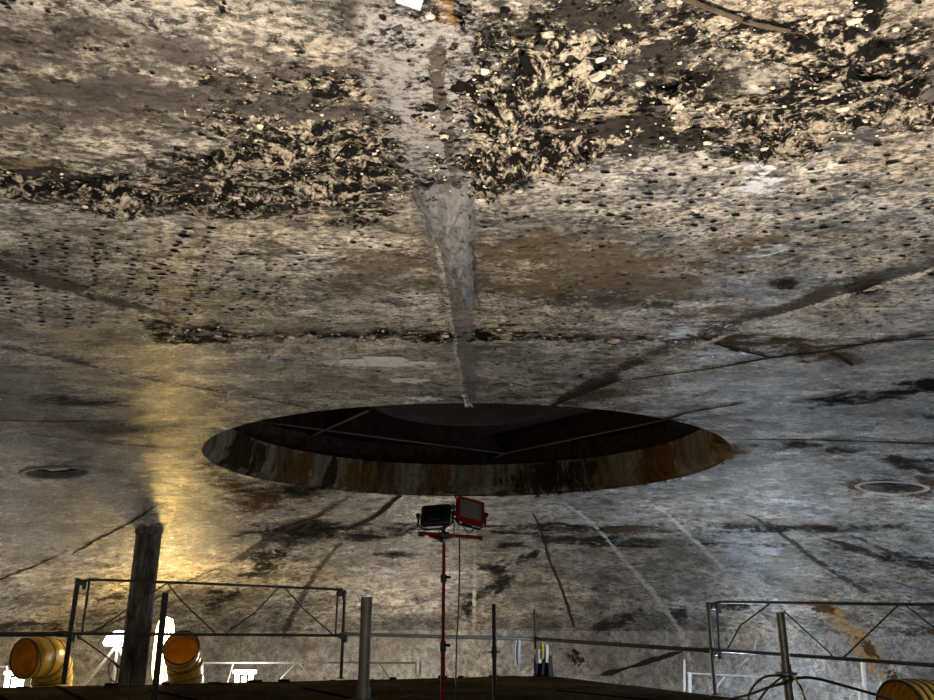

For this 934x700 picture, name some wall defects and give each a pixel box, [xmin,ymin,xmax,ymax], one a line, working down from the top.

spalling [0,0,934,229]
crack [628,333,934,381]
damp [786,379,934,411]
damp [740,441,934,474]
rust [909,476,934,500]
crack [0,504,159,581]
rust [796,598,899,680]